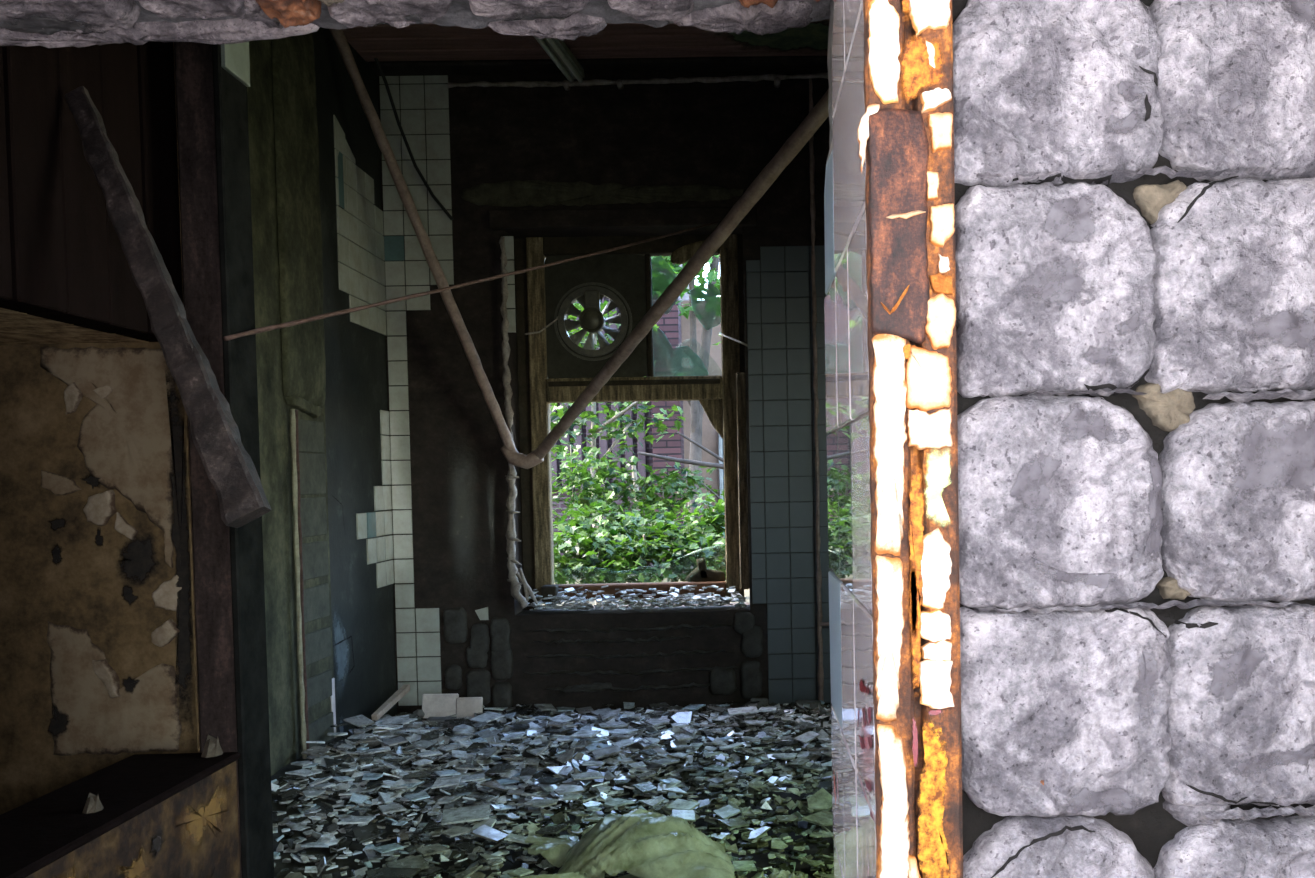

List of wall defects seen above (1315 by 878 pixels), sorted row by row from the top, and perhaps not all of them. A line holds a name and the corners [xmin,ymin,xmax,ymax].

spalling [414,0,834,146]
corrosion [901,37,943,98]
flaking render [0,0,349,419]
damp [48,518,66,565]
damp [119,534,159,606]
damp [166,369,193,733]
corrosion [909,469,924,685]
damp [123,676,139,692]
damp [47,705,69,737]
corrosion [917,722,950,878]
crack [991,825,1095,878]